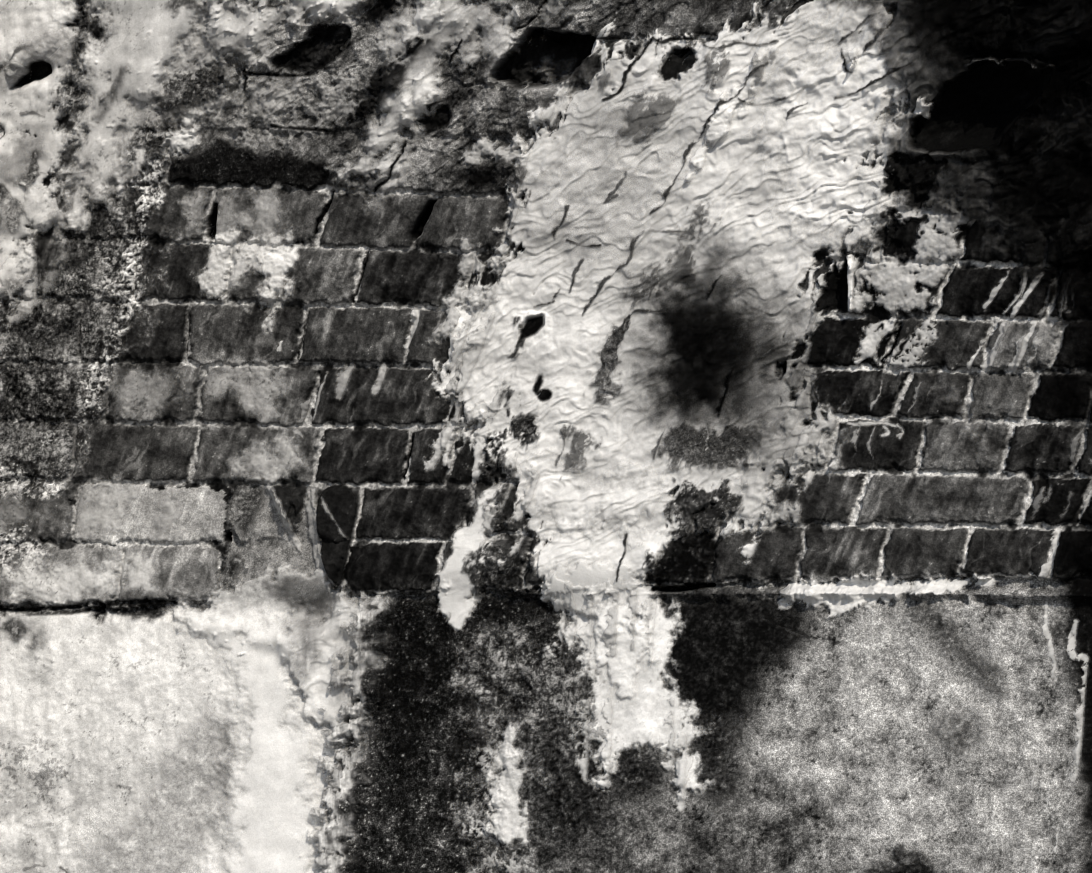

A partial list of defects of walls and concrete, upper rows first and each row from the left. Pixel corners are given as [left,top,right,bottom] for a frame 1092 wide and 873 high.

crack [835,12,912,99]
flaking render [0,0,114,297]
crack [535,36,803,316]
crack [616,309,667,334]
spalling [814,259,848,312]
leakage [967,271,1074,373]
spalling [461,387,540,599]
leakage [316,0,1015,873]
crack [716,368,733,417]
leakage [1032,486,1052,519]
leakage [1070,427,1084,470]
spalling [196,481,358,635]